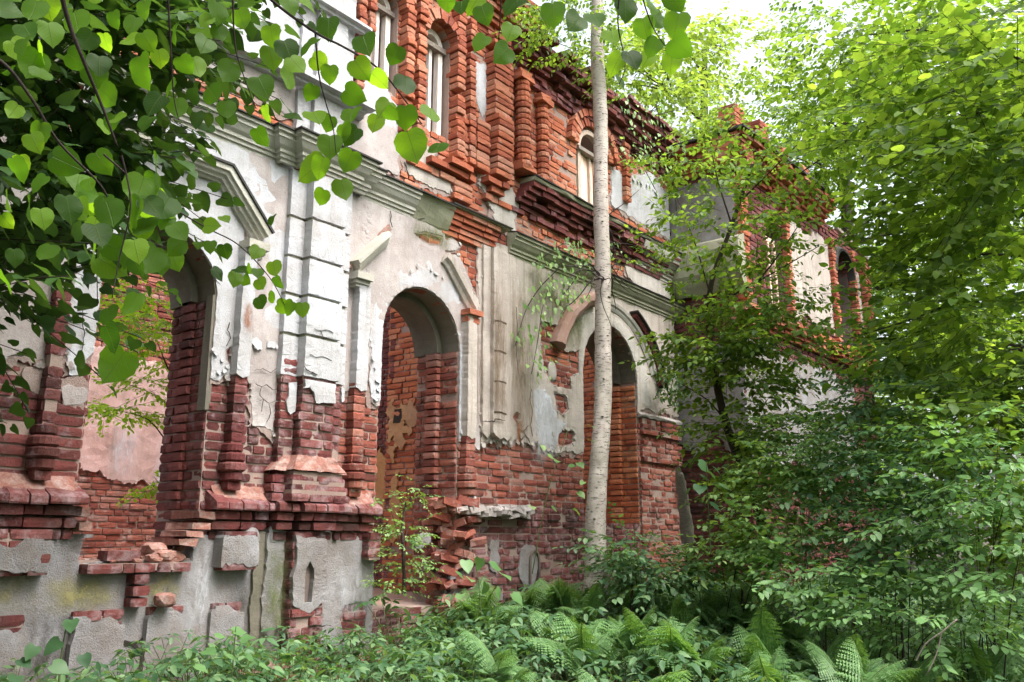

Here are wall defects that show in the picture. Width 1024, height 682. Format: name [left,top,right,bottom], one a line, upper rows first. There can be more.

flaking render [408,172,494,216]
flaking render [0,360,46,475]
flaking render [51,395,85,481]
flaking render [61,343,89,381]
flaking render [202,347,232,489]
flaking render [241,379,276,487]
peeling [252,337,278,350]
crack [254,368,278,421]
flaking render [338,388,348,468]
flaking render [361,356,381,497]
flaking render [424,320,584,622]